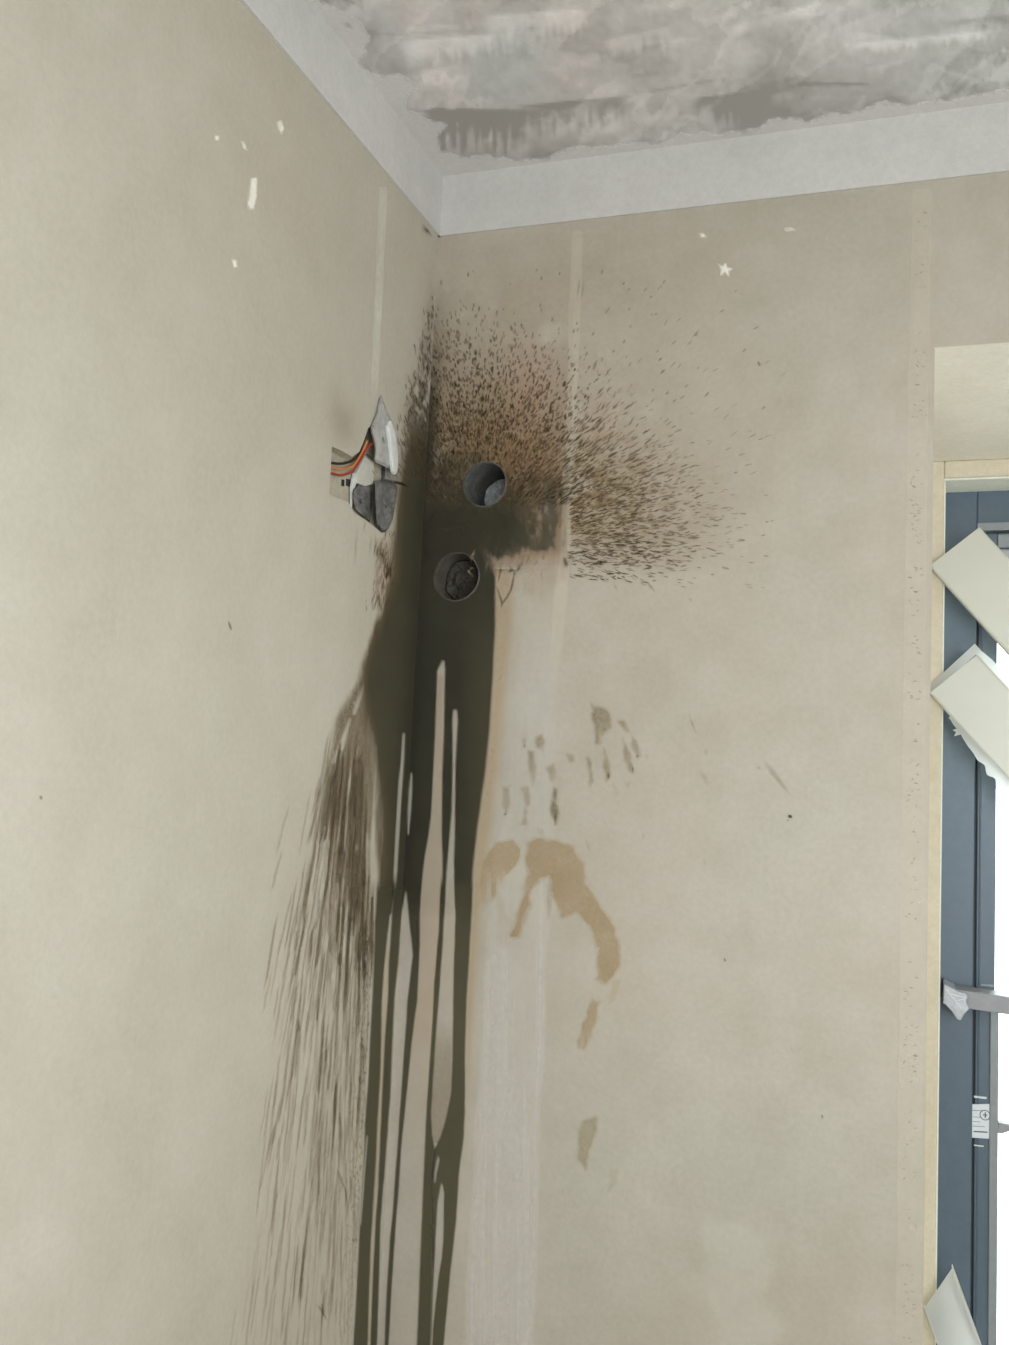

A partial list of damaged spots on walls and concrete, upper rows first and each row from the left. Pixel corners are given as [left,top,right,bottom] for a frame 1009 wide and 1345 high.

damp [266,296,742,1345]